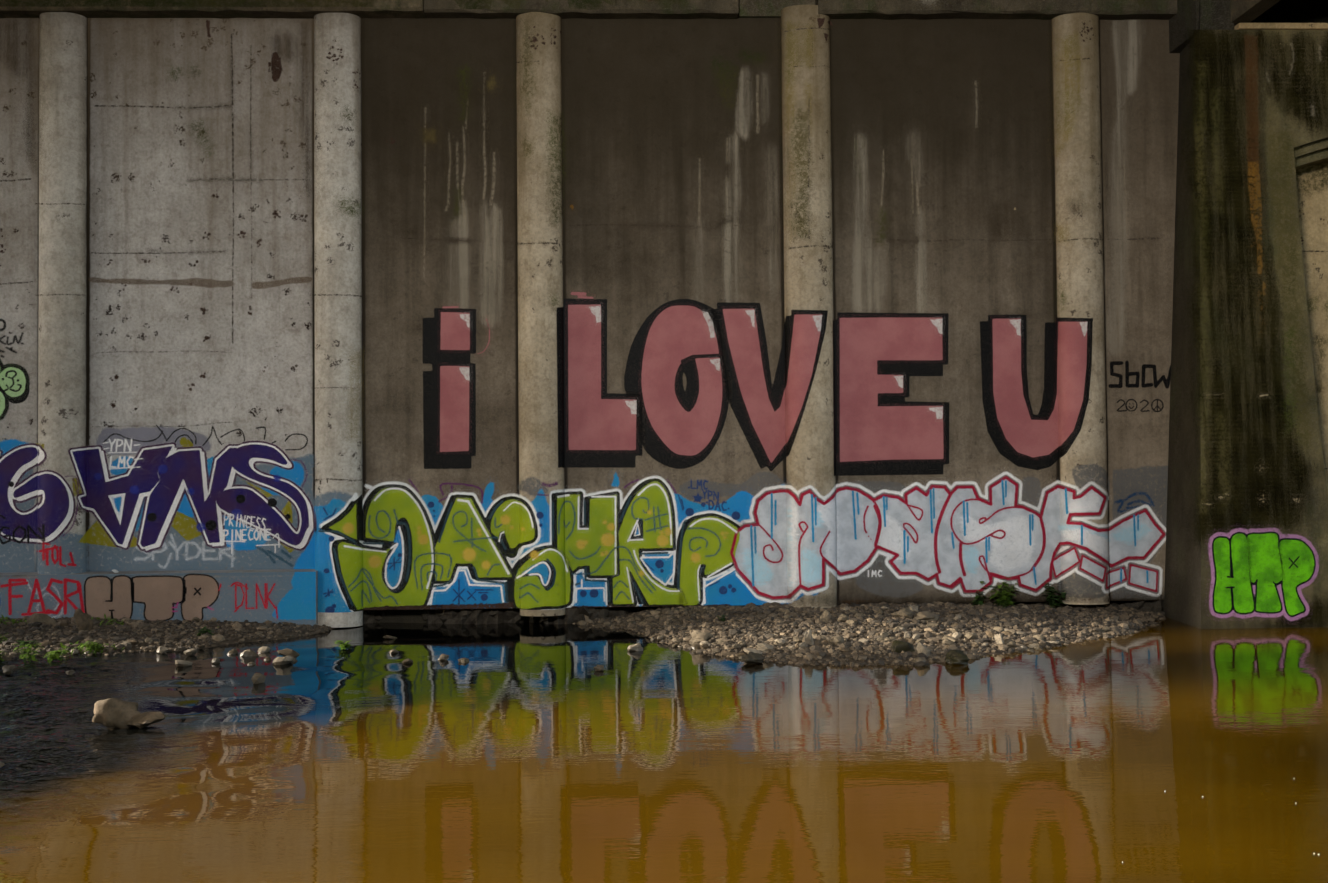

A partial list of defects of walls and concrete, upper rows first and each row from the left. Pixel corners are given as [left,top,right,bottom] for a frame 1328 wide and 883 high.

water stain [419,54,513,338]
water stain [684,14,827,309]
water stain [842,119,938,313]
water stain [1047,20,1328,567]
water stain [1239,579,1328,628]